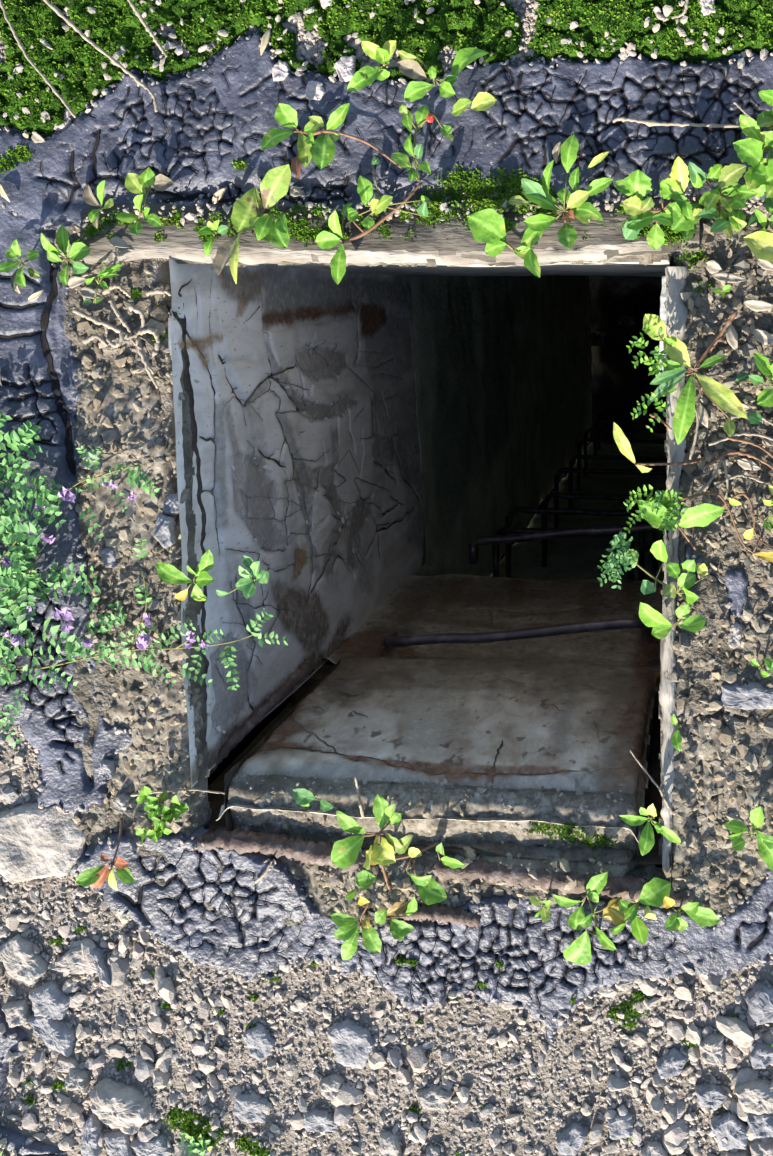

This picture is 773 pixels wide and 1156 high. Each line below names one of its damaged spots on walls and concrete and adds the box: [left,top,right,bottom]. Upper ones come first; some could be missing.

crack [38,64,765,210]
crack [0,245,76,475]
rust [222,272,264,315]
rust [262,301,386,337]
crack [146,279,421,754]
crack [273,672,438,767]
rust [209,659,568,783]
crack [436,740,625,787]
rust [185,829,366,871]
crack [118,849,773,1009]
rust [406,853,651,901]
rust [660,887,714,912]